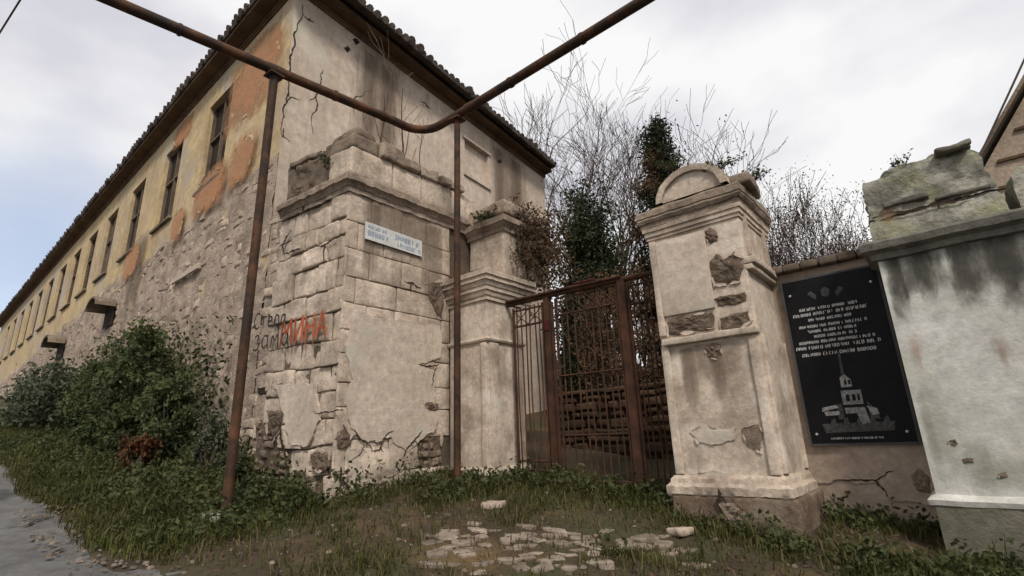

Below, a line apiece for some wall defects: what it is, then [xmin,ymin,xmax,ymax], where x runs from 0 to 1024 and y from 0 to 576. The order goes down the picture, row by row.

flaking render [224,24,283,135]
crack [280,6,323,142]
flaking render [171,131,256,243]
crack [872,187,994,219]
flaking render [122,244,139,280]
spalling [665,226,753,338]
water stain [887,232,1024,312]
flaking render [253,280,444,498]
crack [313,409,424,494]
peeling [690,424,764,454]
crack [837,470,894,498]